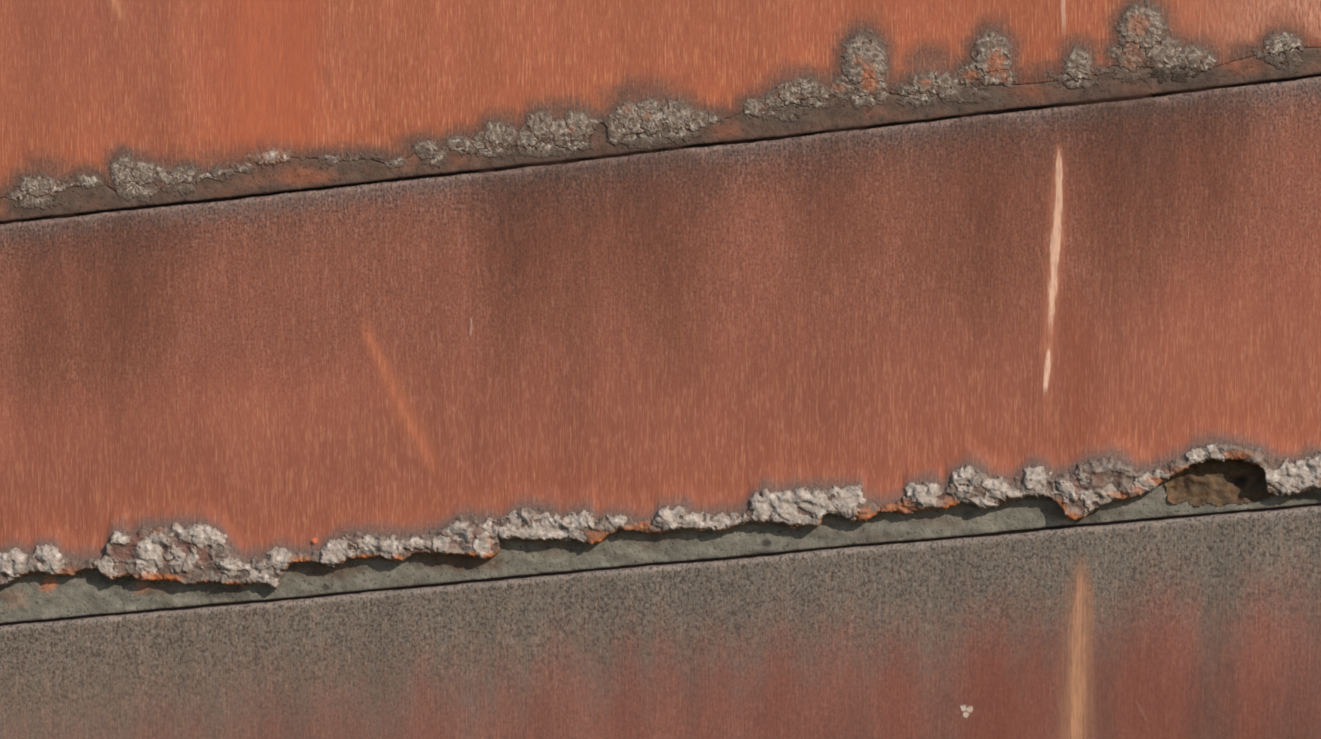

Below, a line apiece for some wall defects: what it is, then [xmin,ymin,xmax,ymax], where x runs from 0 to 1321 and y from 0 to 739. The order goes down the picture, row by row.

rust [826,28,889,110]
rust [933,30,1017,105]
rust [1047,0,1199,93]
spalling [0,443,1321,588]
rust [1067,575,1087,739]